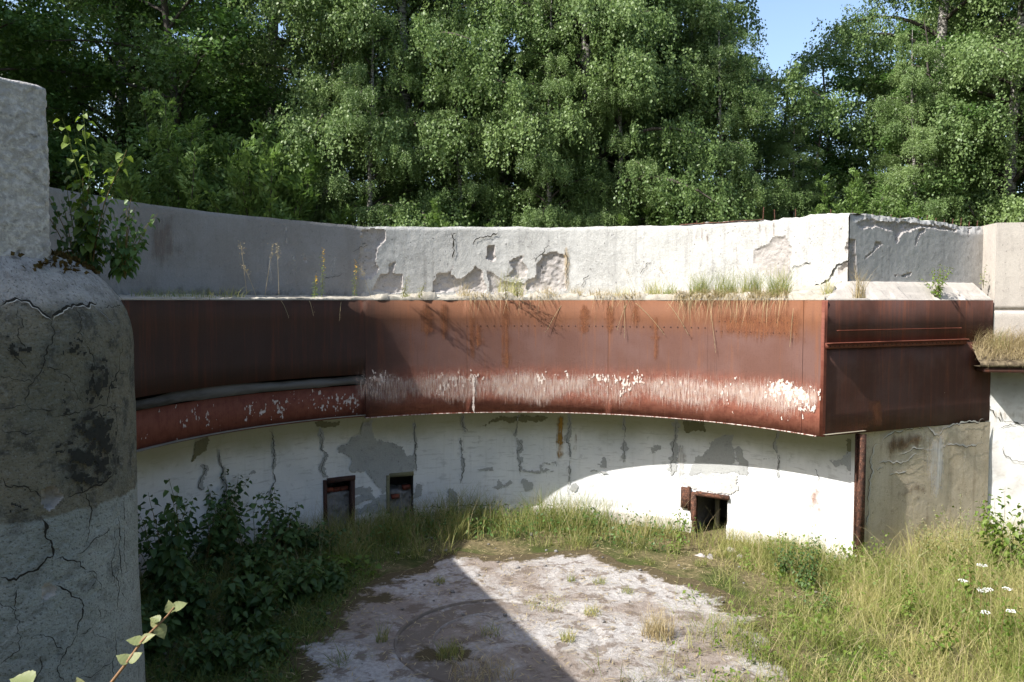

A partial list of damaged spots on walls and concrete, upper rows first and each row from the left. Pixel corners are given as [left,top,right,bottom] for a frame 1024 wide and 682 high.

spalling [358,228,404,294]
spalling [431,245,567,294]
spalling [753,235,792,283]
corrosion [121,300,993,457]
crack [0,293,128,681]
peeling [338,420,422,515]
peeling [683,421,749,476]
crack [866,409,1024,526]